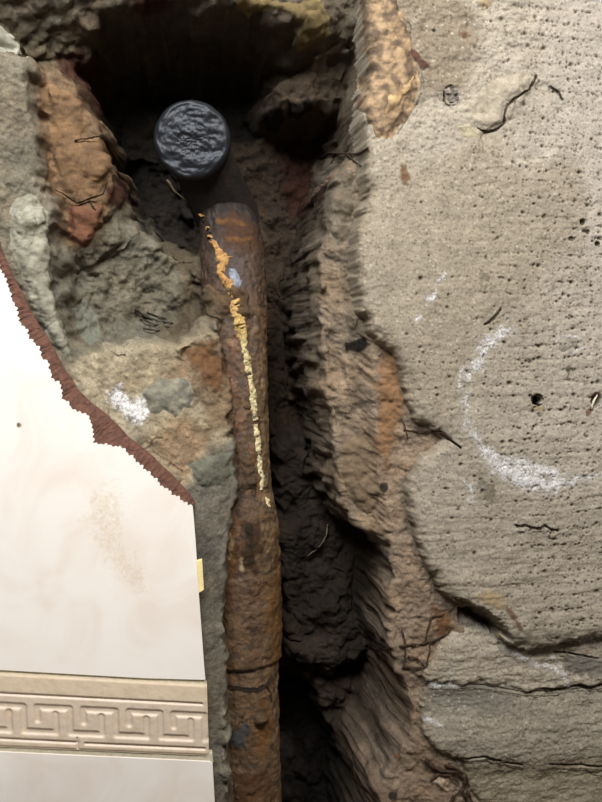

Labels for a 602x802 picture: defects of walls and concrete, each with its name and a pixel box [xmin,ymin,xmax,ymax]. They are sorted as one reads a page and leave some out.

peeling [233,0,331,53]
spalling [355,0,424,139]
peeling [12,205,47,227]
peeling [228,268,242,288]
efflorescence [458,325,514,426]
damp [470,432,594,493]
rust [228,522,264,574]
crack [516,525,559,539]